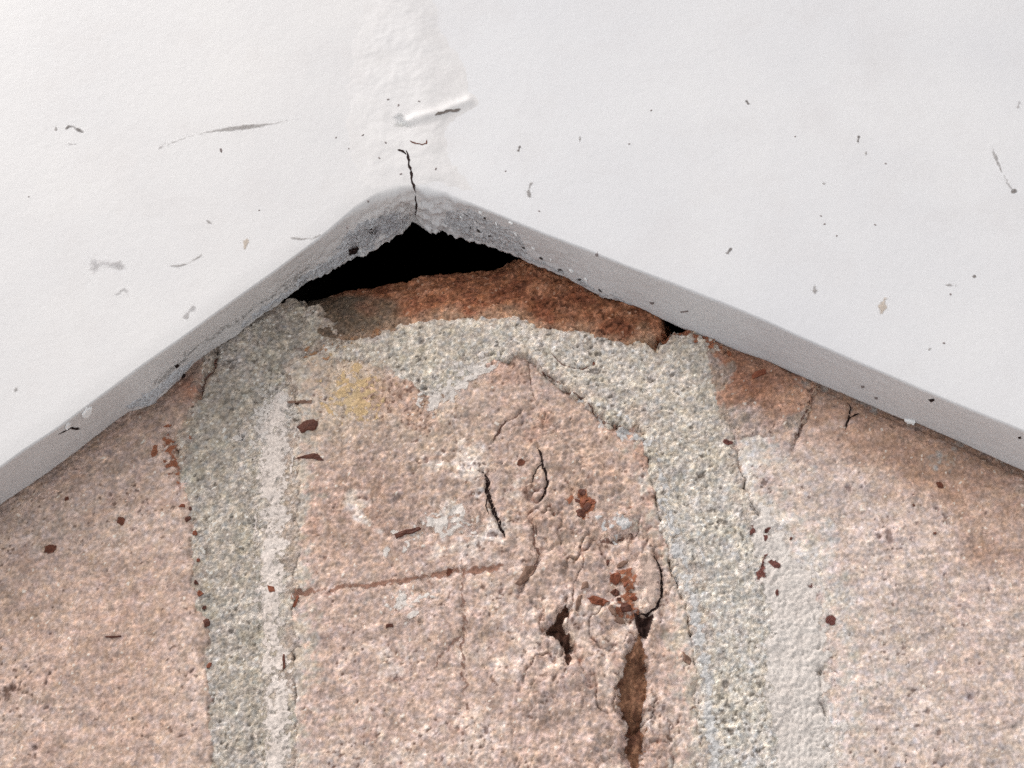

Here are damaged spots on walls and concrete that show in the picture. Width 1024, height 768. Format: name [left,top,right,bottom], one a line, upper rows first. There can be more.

crack [398,140,427,215]
spalling [297,419,318,433]
crack [482,472,505,537]
crack [532,448,549,500]